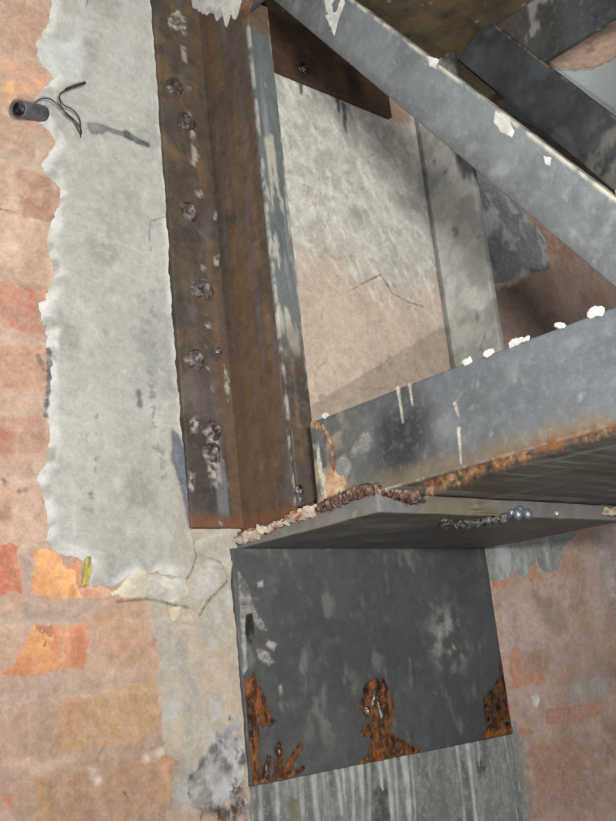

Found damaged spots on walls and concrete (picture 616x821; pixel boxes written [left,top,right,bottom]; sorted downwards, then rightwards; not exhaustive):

corrosion [311,421,346,502]
spalling [0,542,232,623]
spalling [2,623,89,677]
corrosion [244,673,305,785]
corrosion [360,678,422,764]
corrosion [483,660,513,738]
corrosion [217,784,249,821]